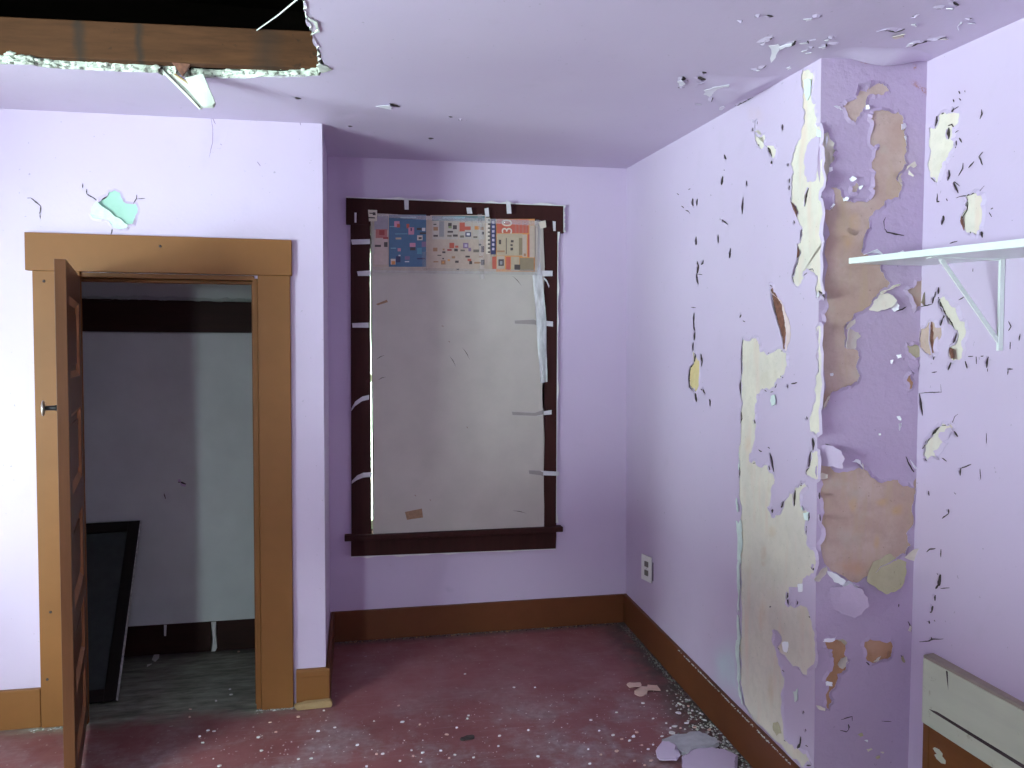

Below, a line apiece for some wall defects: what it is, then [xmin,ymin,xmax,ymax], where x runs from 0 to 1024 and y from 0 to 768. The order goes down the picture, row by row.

peeling [878,14,948,47]
peeling [677,72,730,110]
crack [82,184,109,203]
peeling [958,189,987,239]
peeling [689,350,701,394]
peeling [735,35,970,768]